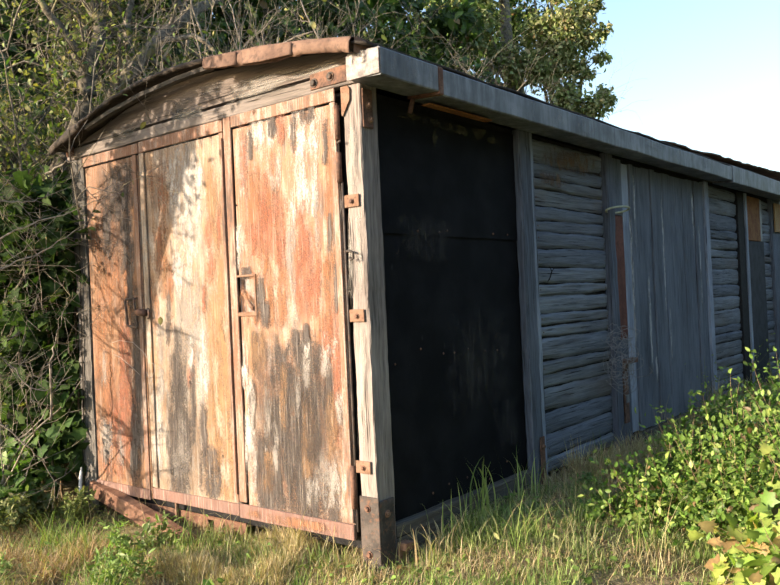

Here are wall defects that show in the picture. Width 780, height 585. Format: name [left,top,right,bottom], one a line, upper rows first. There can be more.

peeling [236,121,277,206]
peeling [283,108,322,297]
peeling [168,141,210,408]
corrosion [239,115,341,459]
corrosion [95,192,136,475]
peeling [156,324,164,467]
corrosion [269,516,334,532]
peeling [295,343,310,417]
corrosion [301,403,315,478]
peeling [307,455,347,509]
peeling [320,342,337,377]
peeling [335,395,343,424]